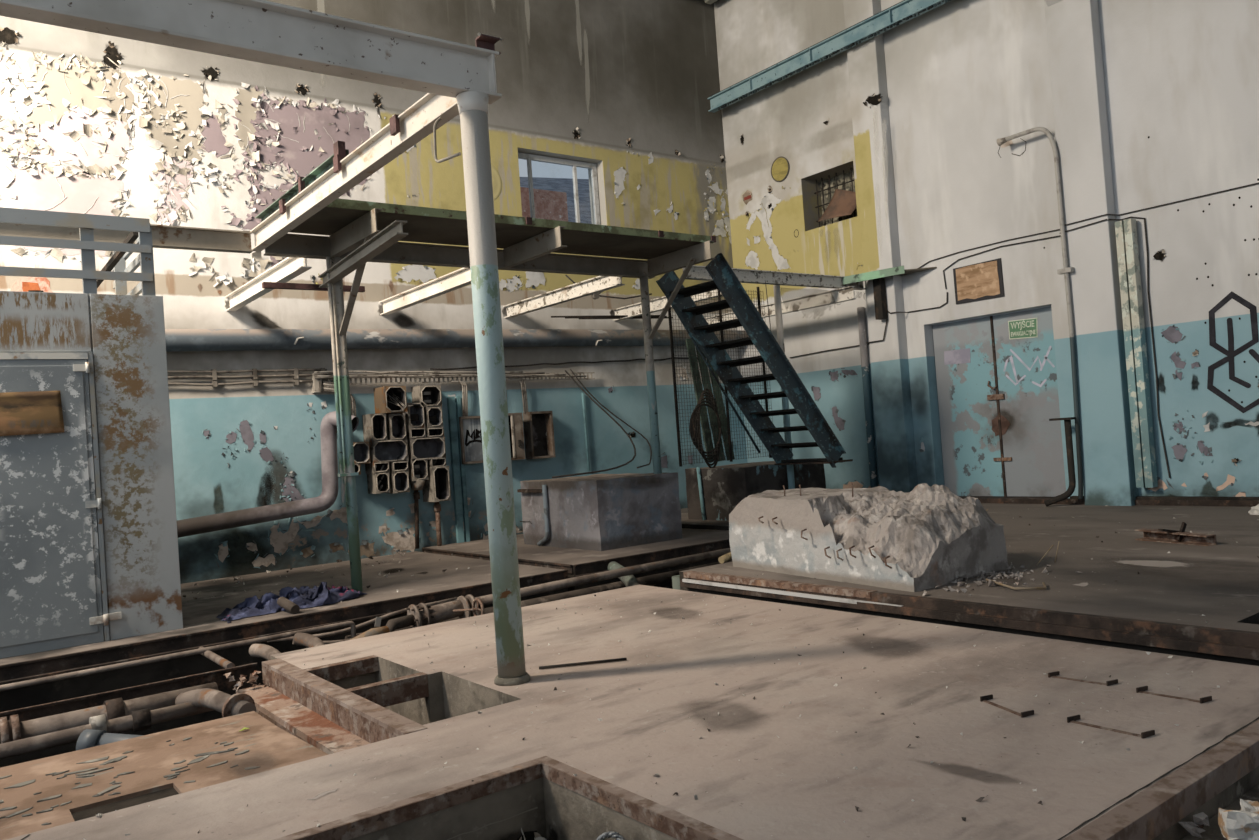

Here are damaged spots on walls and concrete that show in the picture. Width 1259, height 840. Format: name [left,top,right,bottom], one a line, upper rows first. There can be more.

peeling [0,27,388,231]
peeling [11,246,113,262]
peeling [188,251,287,287]
peeling [394,265,437,283]
peeling [499,271,547,292]